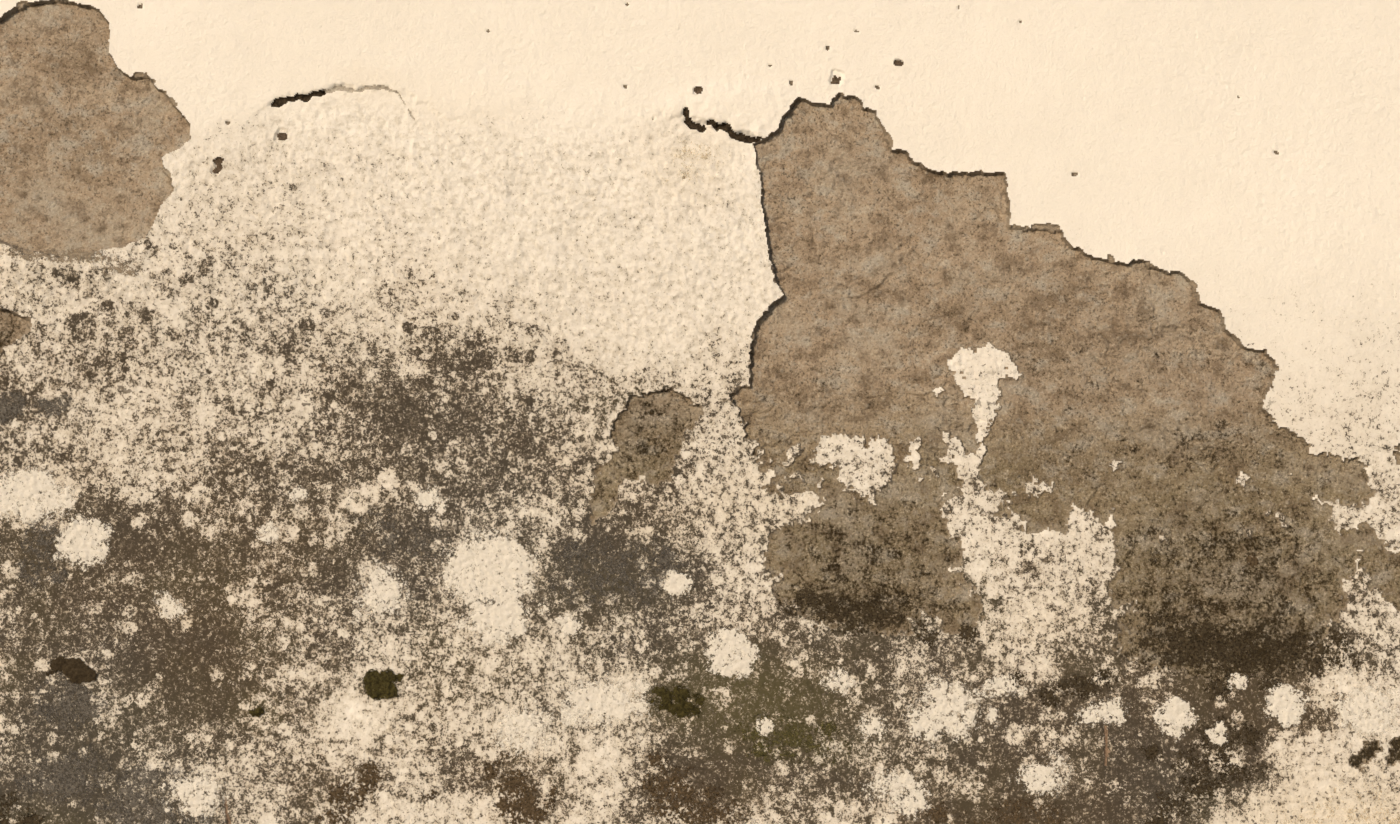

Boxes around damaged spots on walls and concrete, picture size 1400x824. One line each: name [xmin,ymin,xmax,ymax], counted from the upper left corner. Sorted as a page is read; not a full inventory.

spalling [0,0,191,258]
crack [271,84,415,120]
spalling [0,308,32,354]
water stain [0,391,76,425]
spalling [689,73,1400,686]
water stain [347,506,451,562]
water stain [548,534,699,613]
water stain [779,585,941,649]
water stain [958,622,979,646]
water stain [0,656,220,824]
water stain [1036,669,1118,708]
water stain [1119,606,1368,824]